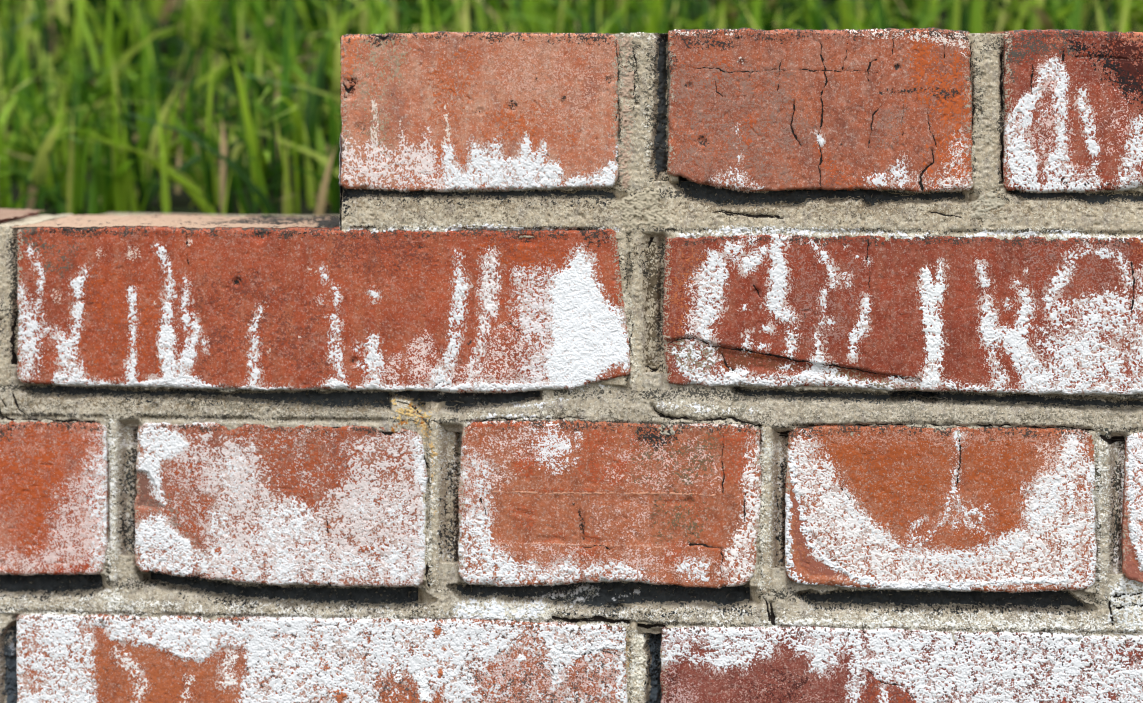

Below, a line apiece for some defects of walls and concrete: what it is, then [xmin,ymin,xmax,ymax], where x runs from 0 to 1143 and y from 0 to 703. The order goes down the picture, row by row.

damp [339,29,737,193]
crack [686,36,894,188]
crack [868,104,962,218]
crack [670,338,920,379]
damp [0,208,1143,703]
crack [848,423,1143,490]